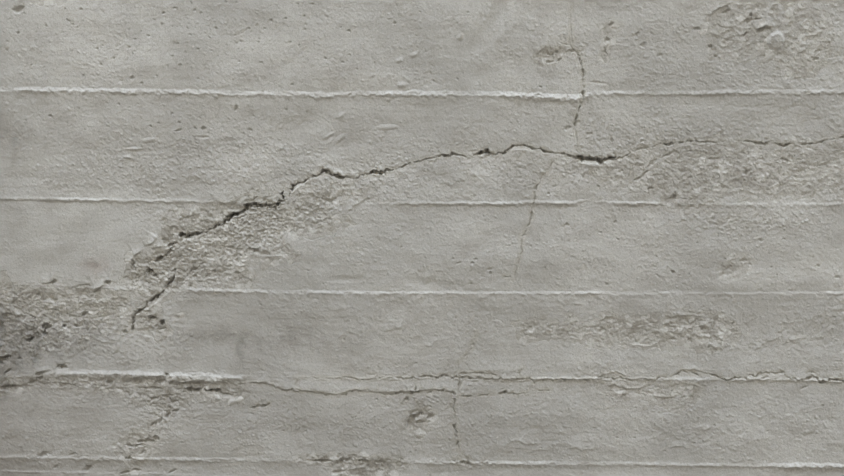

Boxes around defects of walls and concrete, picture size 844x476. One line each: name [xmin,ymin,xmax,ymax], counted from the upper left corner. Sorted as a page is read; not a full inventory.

crack [120,1,844,337]
spalling [0,180,379,476]
crack [219,365,844,460]